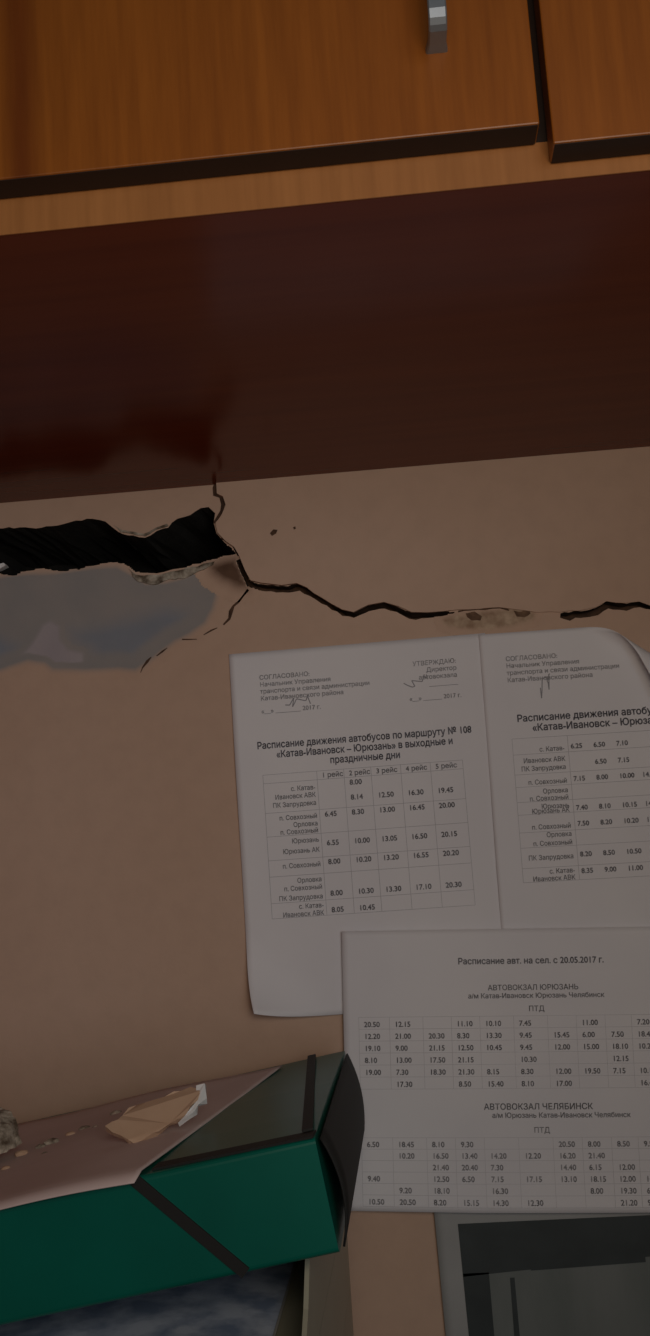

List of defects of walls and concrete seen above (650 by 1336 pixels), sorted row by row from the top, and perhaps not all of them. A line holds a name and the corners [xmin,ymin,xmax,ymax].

peeling [0,507,261,681]
crack [140,484,650,673]